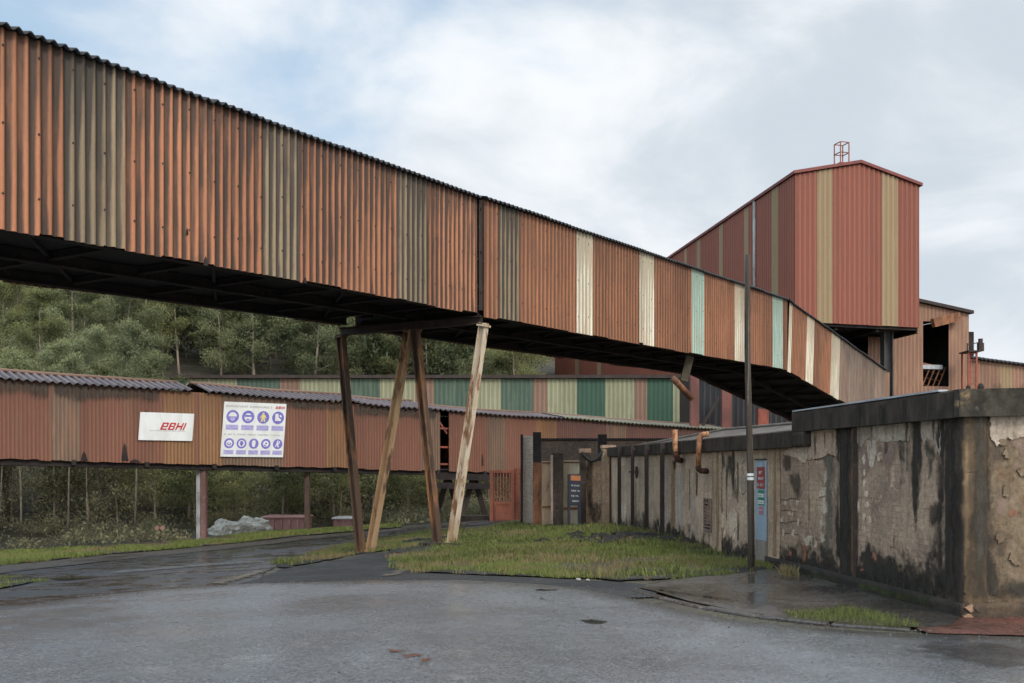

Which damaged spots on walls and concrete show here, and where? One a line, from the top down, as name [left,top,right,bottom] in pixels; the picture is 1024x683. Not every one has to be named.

peeling [780,471,827,565]
peeling [857,420,941,536]
water stain [779,401,1024,599]
peeling [989,416,1024,459]